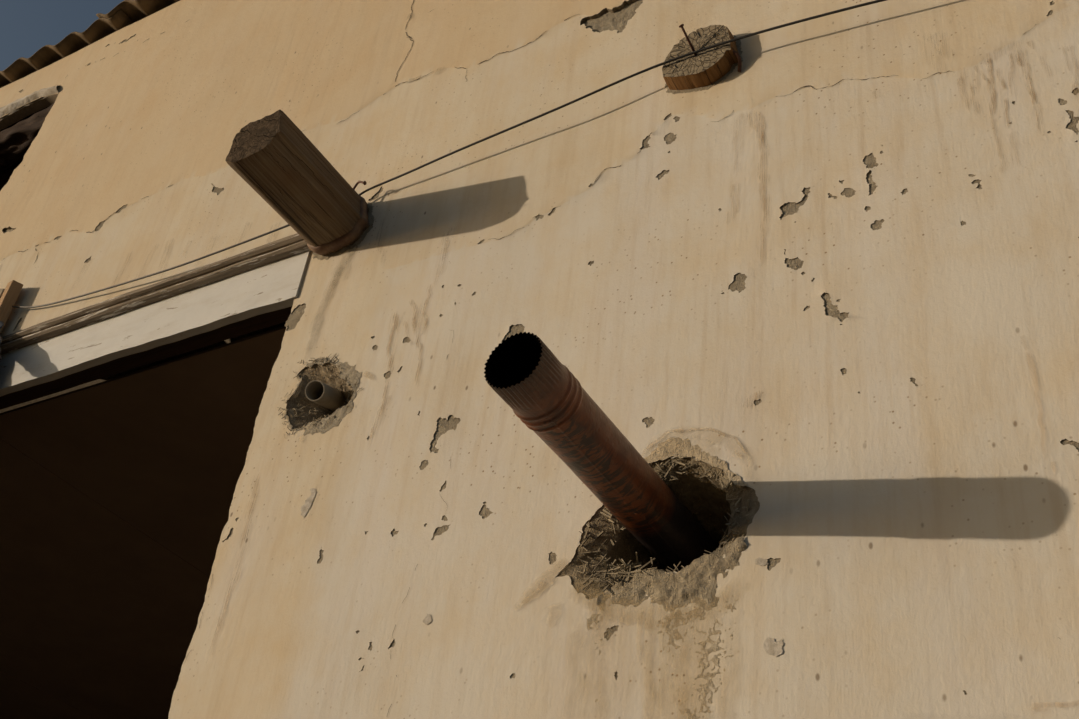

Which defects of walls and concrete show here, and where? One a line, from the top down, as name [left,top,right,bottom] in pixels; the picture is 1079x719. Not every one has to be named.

flaking render [583,0,643,33]
crack [383,0,434,95]
peeling [1058,88,1079,142]
peeling [780,188,810,219]
peeling [784,250,814,282]
peeling [723,273,747,294]
peeling [821,293,849,322]
peeling [504,325,525,340]
spalling [277,354,362,436]
spalling [549,437,760,719]